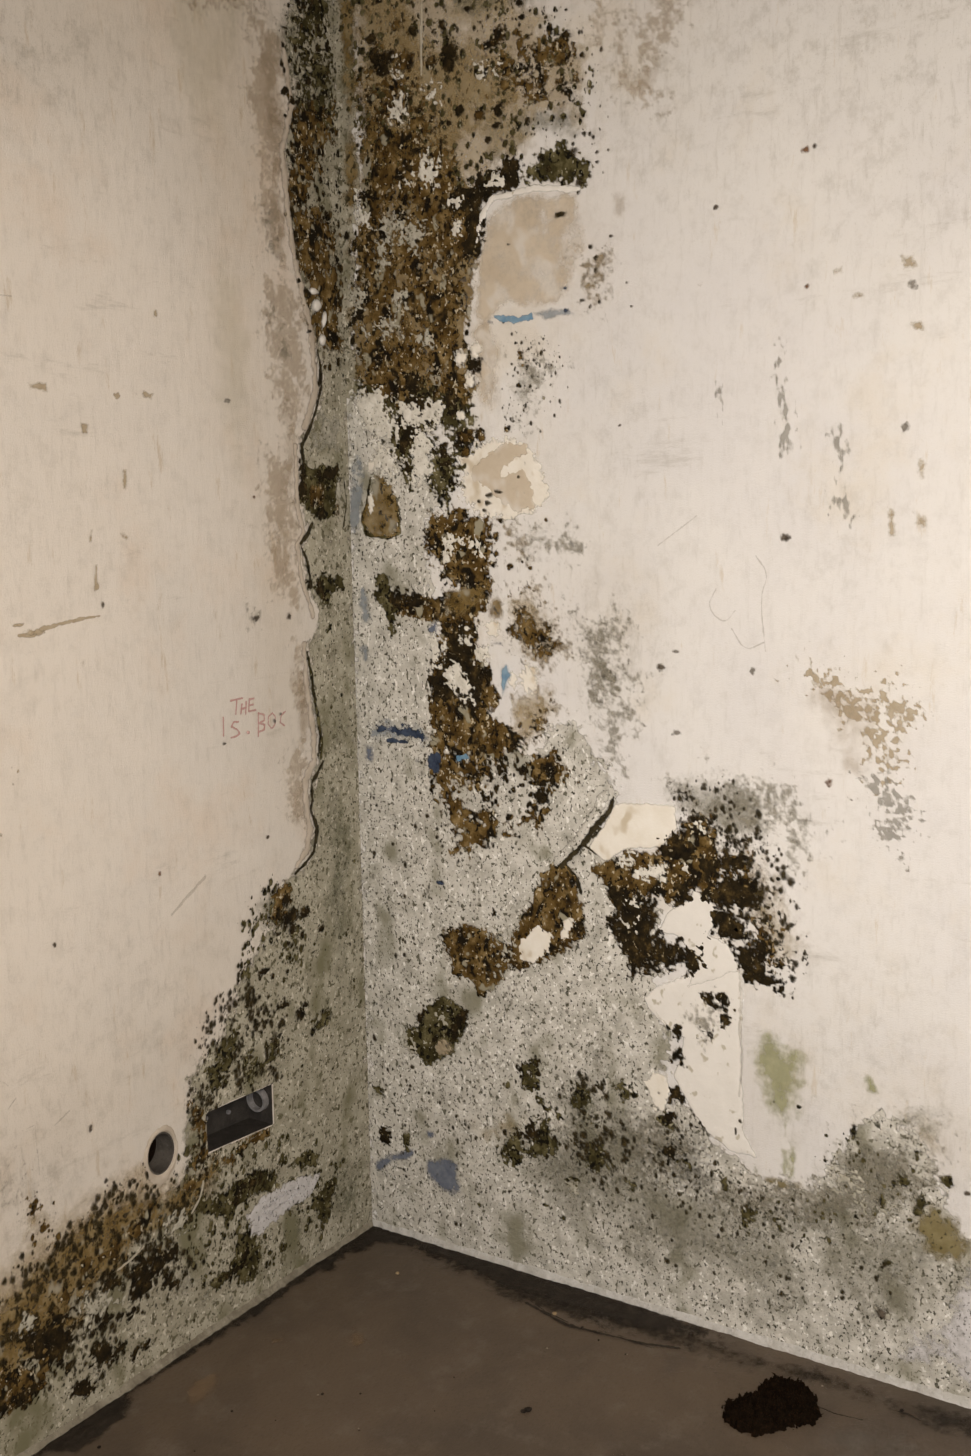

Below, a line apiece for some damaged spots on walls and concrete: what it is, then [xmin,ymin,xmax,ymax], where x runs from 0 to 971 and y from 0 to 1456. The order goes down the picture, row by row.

flaking render [282,0,343,294]
mould [279,0,645,863]
peeling [475,184,605,400]
peeling [774,357,790,457]
flaking render [0,102,374,1456]
mould [397,776,811,1066]
flaking render [347,397,971,1399]
water stain [0,874,868,1456]
water stain [496,1053,954,1244]